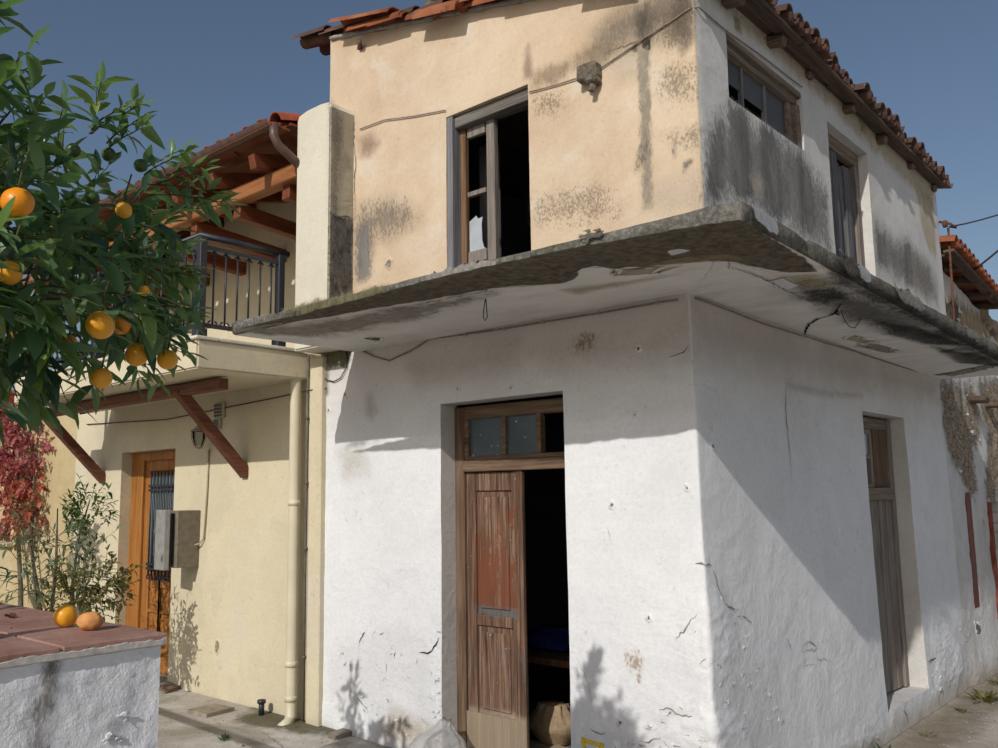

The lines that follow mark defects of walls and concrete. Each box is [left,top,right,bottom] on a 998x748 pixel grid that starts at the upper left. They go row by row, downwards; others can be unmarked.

damp [636,46,653,205]
damp [240,100,998,366]
crack [378,261,843,335]
crack [695,562,752,623]
damp [28,661,58,748]